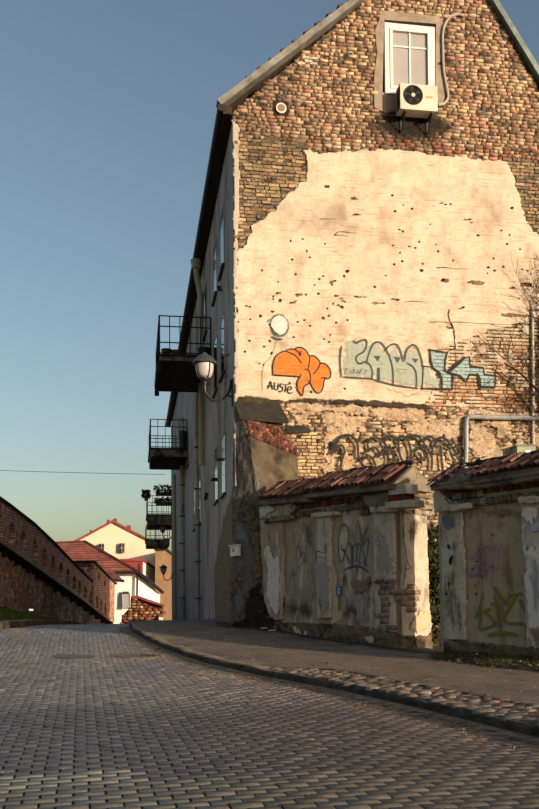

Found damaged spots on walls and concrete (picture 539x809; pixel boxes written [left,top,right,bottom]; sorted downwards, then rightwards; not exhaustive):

flaking render [232,136,307,246]
flaking render [503,157,539,232]
flaking render [417,313,539,410]
flaking render [245,415,301,457]
peeling [228,505,281,631]
flaking render [329,576,433,648]
peeling [518,496,539,648]